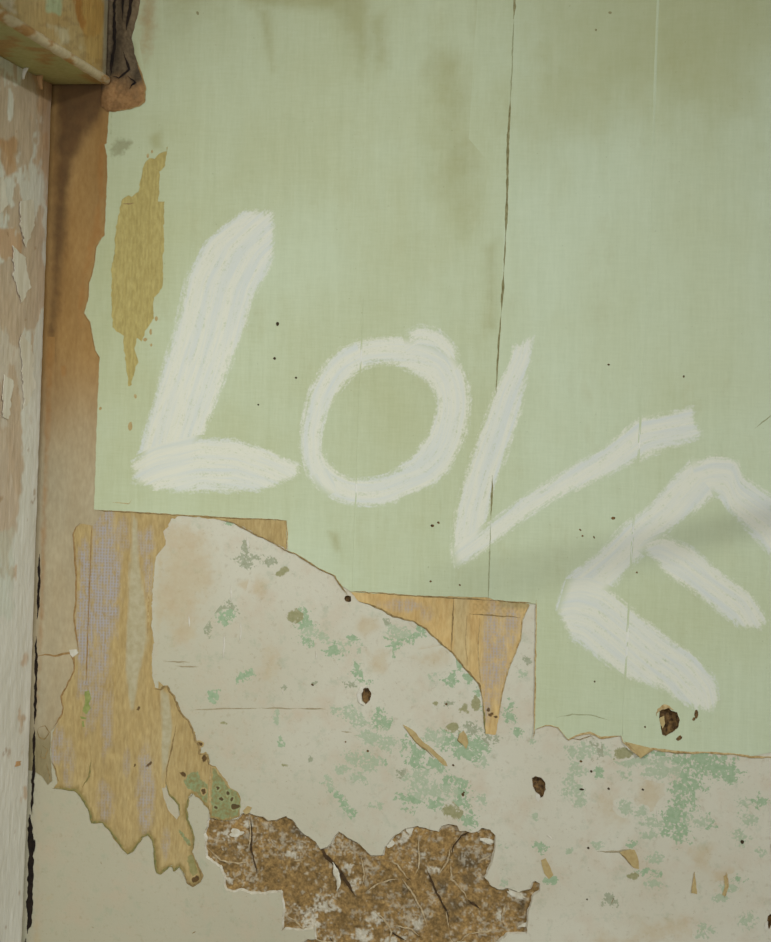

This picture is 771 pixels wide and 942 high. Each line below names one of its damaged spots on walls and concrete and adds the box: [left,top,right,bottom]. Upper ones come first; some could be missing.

peeling [12,199,35,303]
peeling [111,146,168,398]
peeling [2,334,36,419]
peeling [230,534,292,578]
peeling [283,608,304,625]
peeling [320,630,361,661]
spalling [203,659,561,942]
peeling [561,736,755,852]
peeling [709,879,740,904]